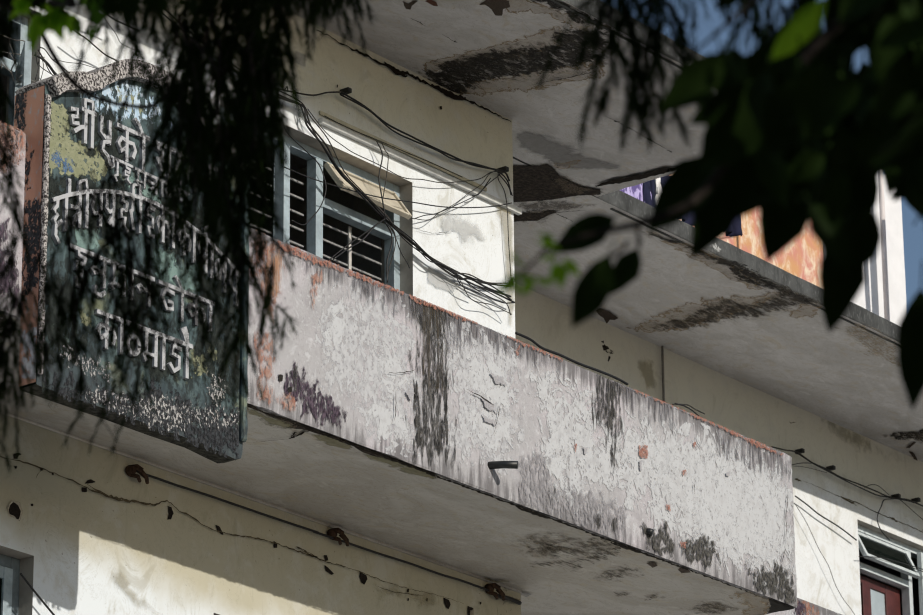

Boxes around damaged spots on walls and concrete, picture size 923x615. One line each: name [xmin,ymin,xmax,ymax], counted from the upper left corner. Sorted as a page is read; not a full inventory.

peeling [403,0,438,10]
peeling [479,0,510,16]
water stain [14,92,27,131]
spalling [513,160,601,222]
water stain [0,107,821,615]
peeling [60,241,797,591]
spalling [885,430,923,461]
crack [0,456,457,602]